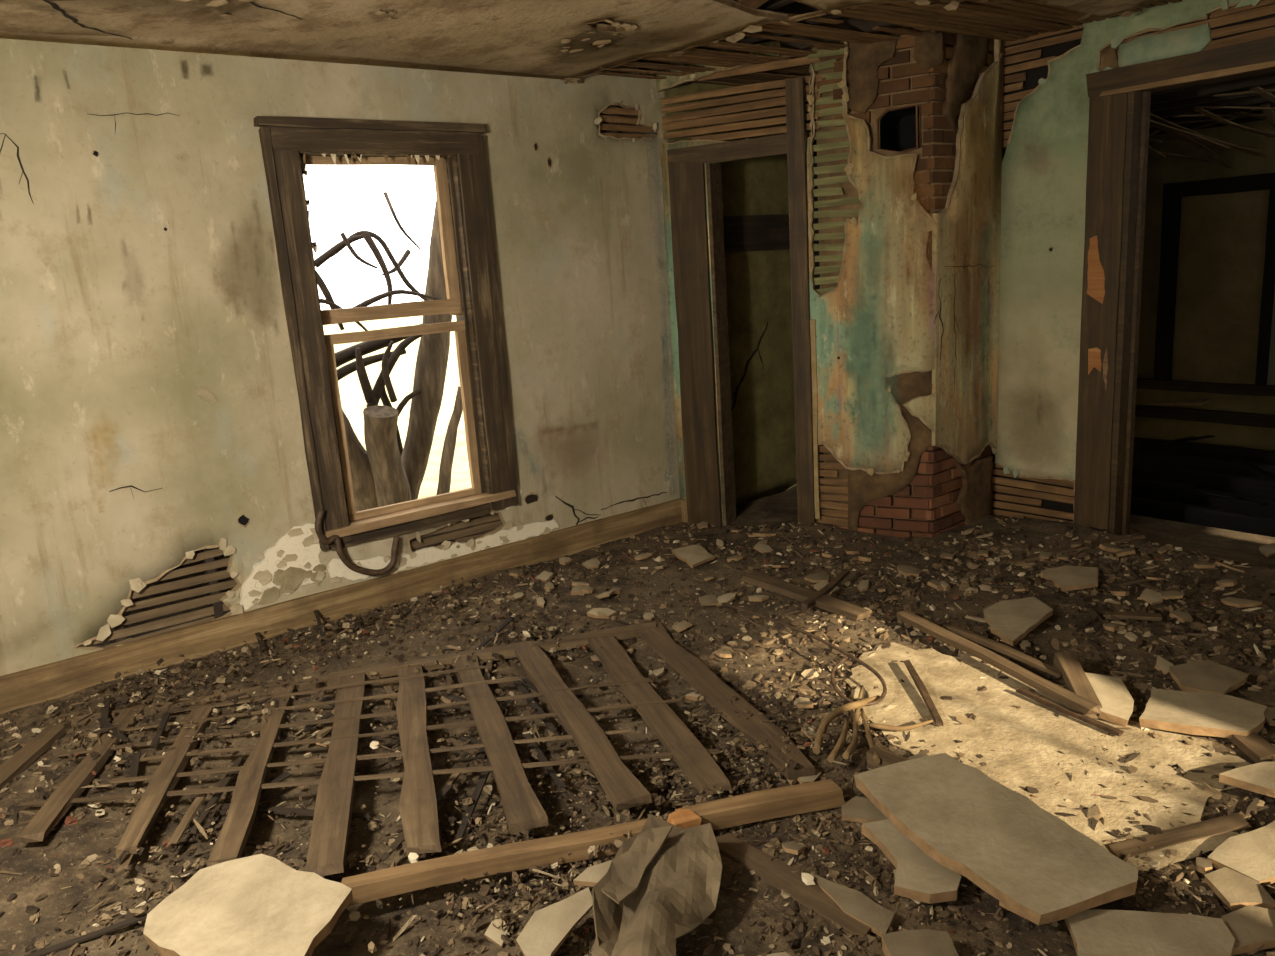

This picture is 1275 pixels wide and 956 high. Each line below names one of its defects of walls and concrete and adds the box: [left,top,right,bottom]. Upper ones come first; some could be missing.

peeling [205,0,255,17]
flaking render [1090,0,1275,73]
crack [0,133,34,204]
flaking render [560,0,1160,297]
flaking render [814,370,1075,537]
flaking render [523,492,539,505]
flaking render [73,510,559,650]